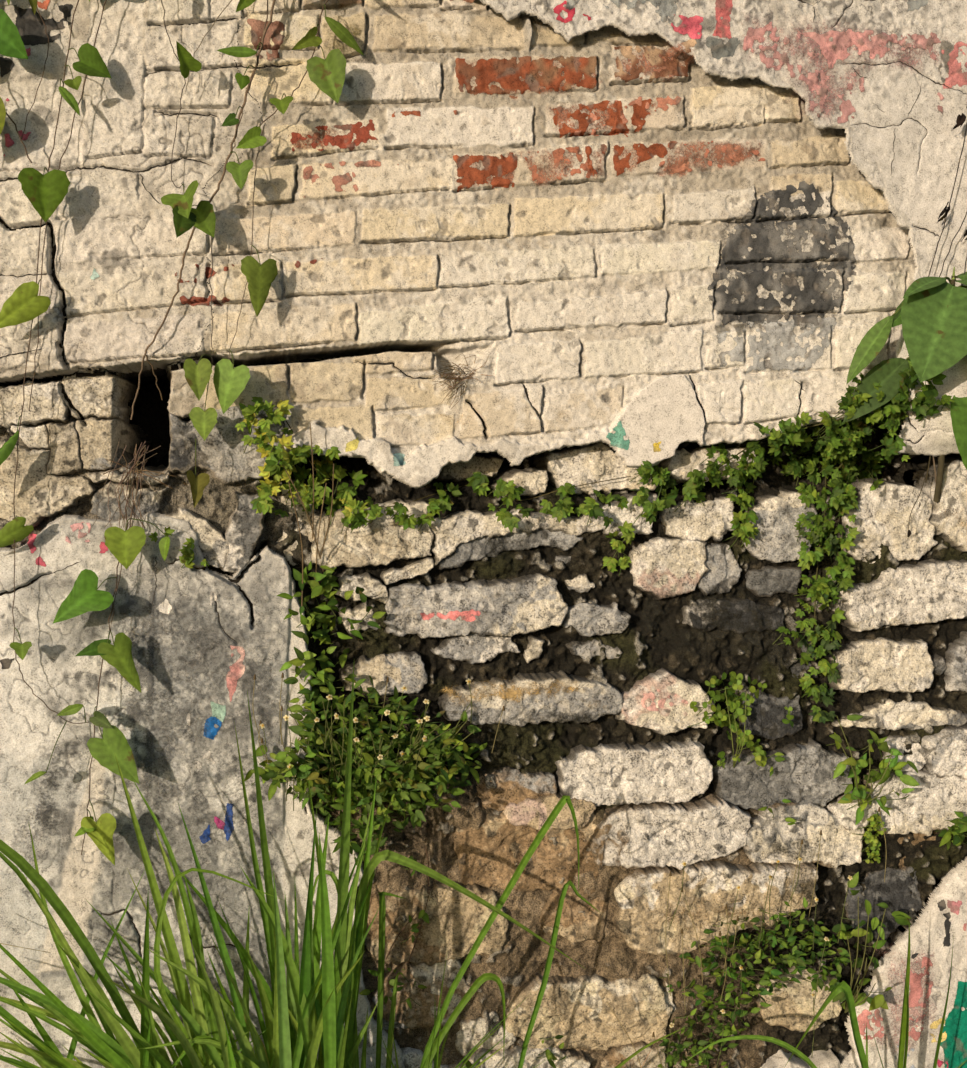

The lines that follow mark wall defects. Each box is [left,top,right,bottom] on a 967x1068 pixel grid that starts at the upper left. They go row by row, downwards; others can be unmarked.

peeling [706,0,944,124]
crack [838,61,966,174]
crack [0,218,435,424]
crack [467,402,486,437]
crack [690,378,706,429]
crack [0,562,79,596]
spalling [1,495,100,567]
spalling [131,468,276,536]
crack [169,542,266,643]
peeling [436,609,481,622]
spalling [362,860,492,1068]
peeling [857,953,967,1068]